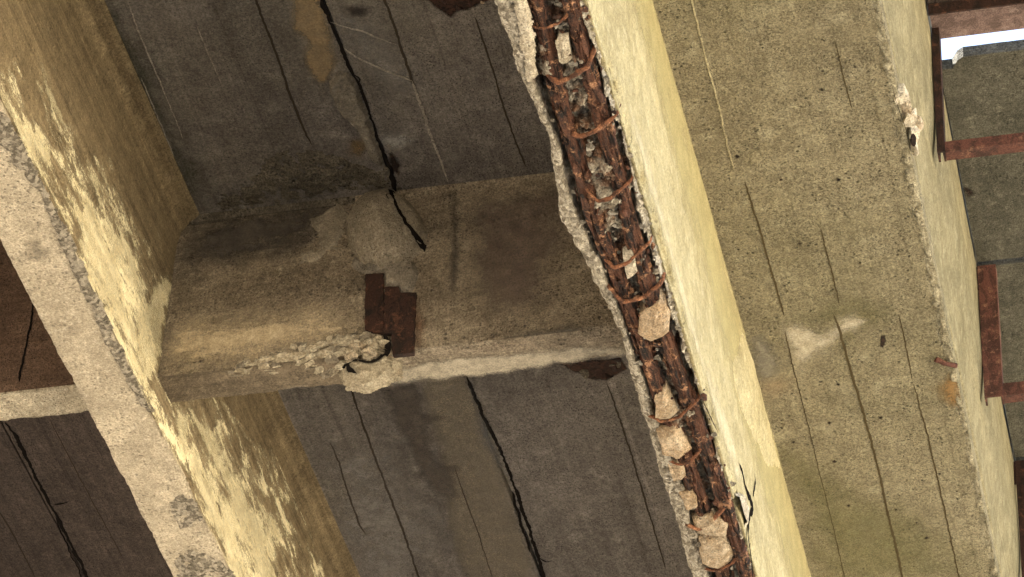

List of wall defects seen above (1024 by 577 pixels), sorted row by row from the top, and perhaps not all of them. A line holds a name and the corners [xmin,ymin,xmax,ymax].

crack [320,0,448,252]
peeling [228,331,387,379]
spalling [428,0,755,577]
crack [691,0,845,577]
leakage [787,318,863,361]
crack [0,420,122,577]
crack [454,467,492,576]
crack [466,376,550,577]